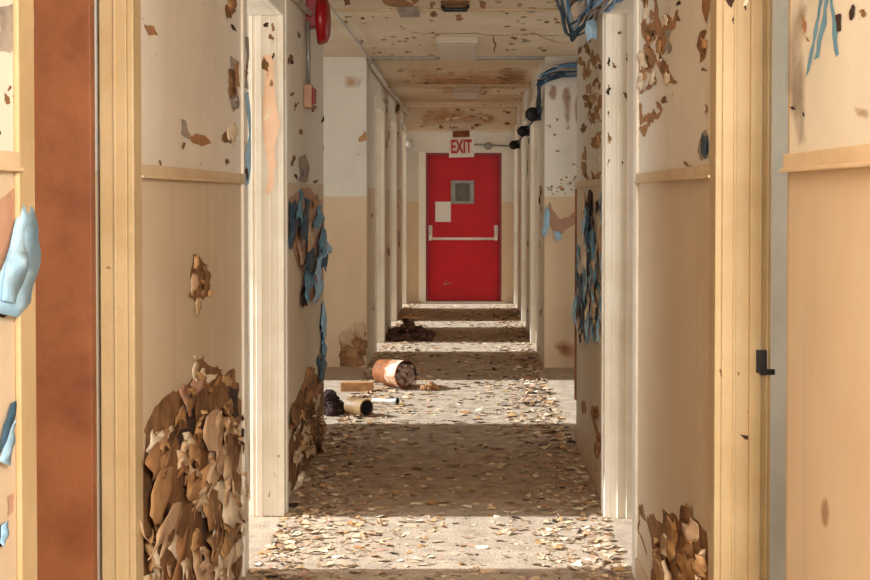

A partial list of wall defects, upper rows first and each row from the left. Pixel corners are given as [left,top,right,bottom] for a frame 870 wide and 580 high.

peeling [0,188,41,318]
peeling [181,119,211,149]
peeling [189,254,213,315]
peeling [222,0,251,186]
peeling [262,53,280,195]
peeling [288,155,332,491]
peeling [527,40,616,345]
peeling [626,0,680,137]
peeling [0,493,14,547]
peeling [0,401,17,465]
peeling [140,355,249,580]
peeling [638,503,708,580]